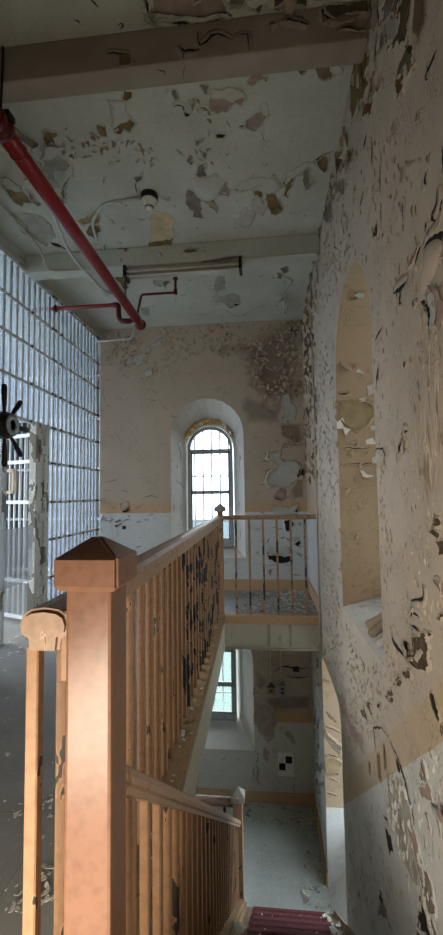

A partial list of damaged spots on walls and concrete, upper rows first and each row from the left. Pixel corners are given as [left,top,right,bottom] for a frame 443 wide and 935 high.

crack [157,28,253,78]
peeling [14,89,159,205]
peeling [1,177,66,250]
peeling [75,208,129,262]
peeling [120,196,177,257]
leakage [251,322,297,396]
peeling [138,0,443,810]